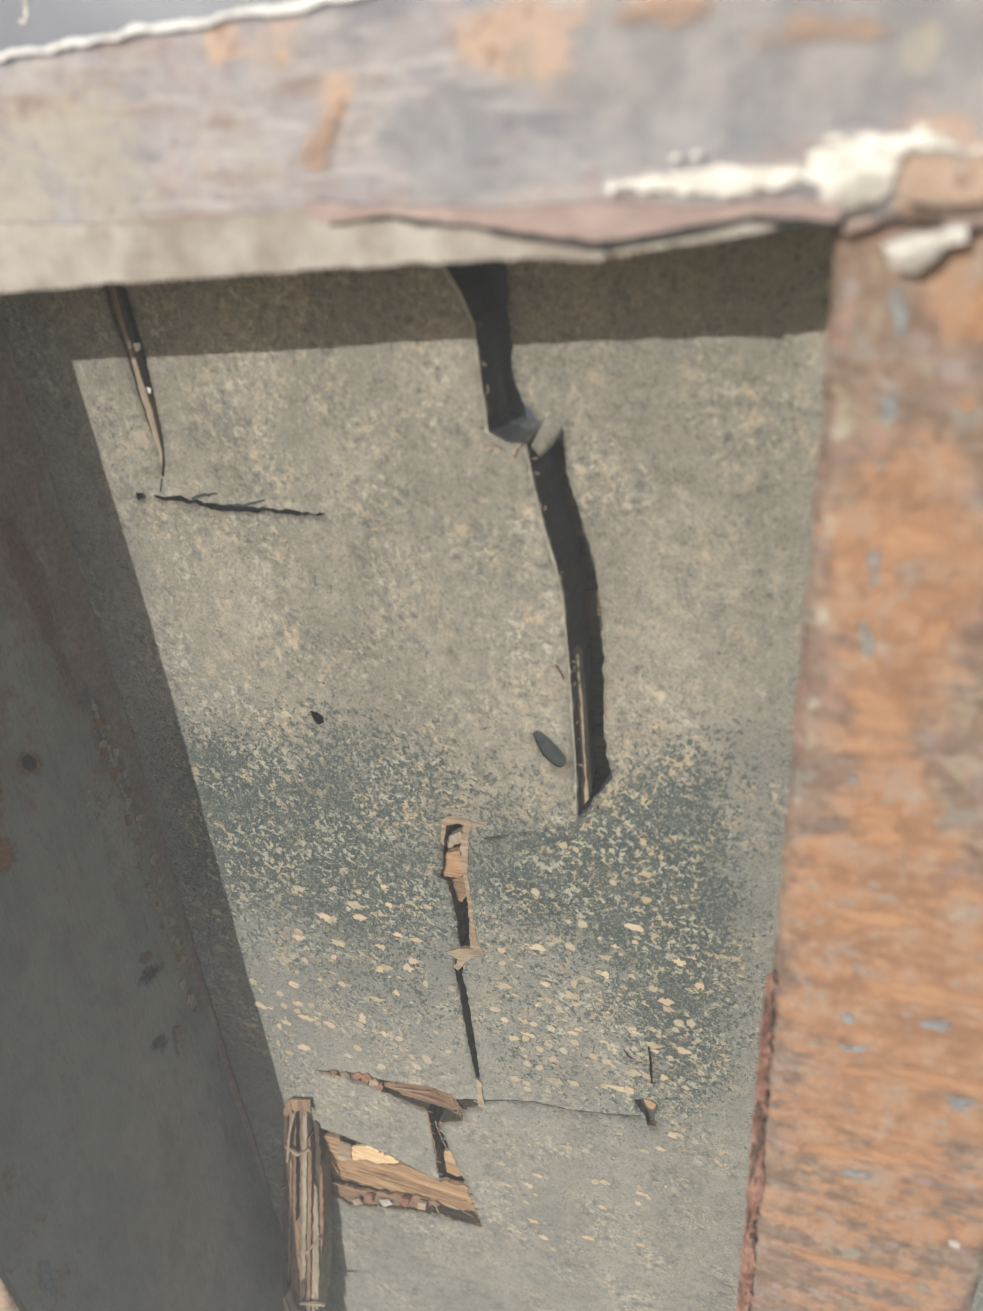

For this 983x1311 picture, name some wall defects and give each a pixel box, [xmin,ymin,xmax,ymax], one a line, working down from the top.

crack [104,282,324,516]
crack [442,259,613,816]
spalling [243,890,481,1225]
crack [440,816,497,1108]
crack [625,1047,653,1084]
rust [736,970,775,1311]
rust [824,907,924,931]
rust [835,1062,983,1095]
rust [792,1249,913,1284]